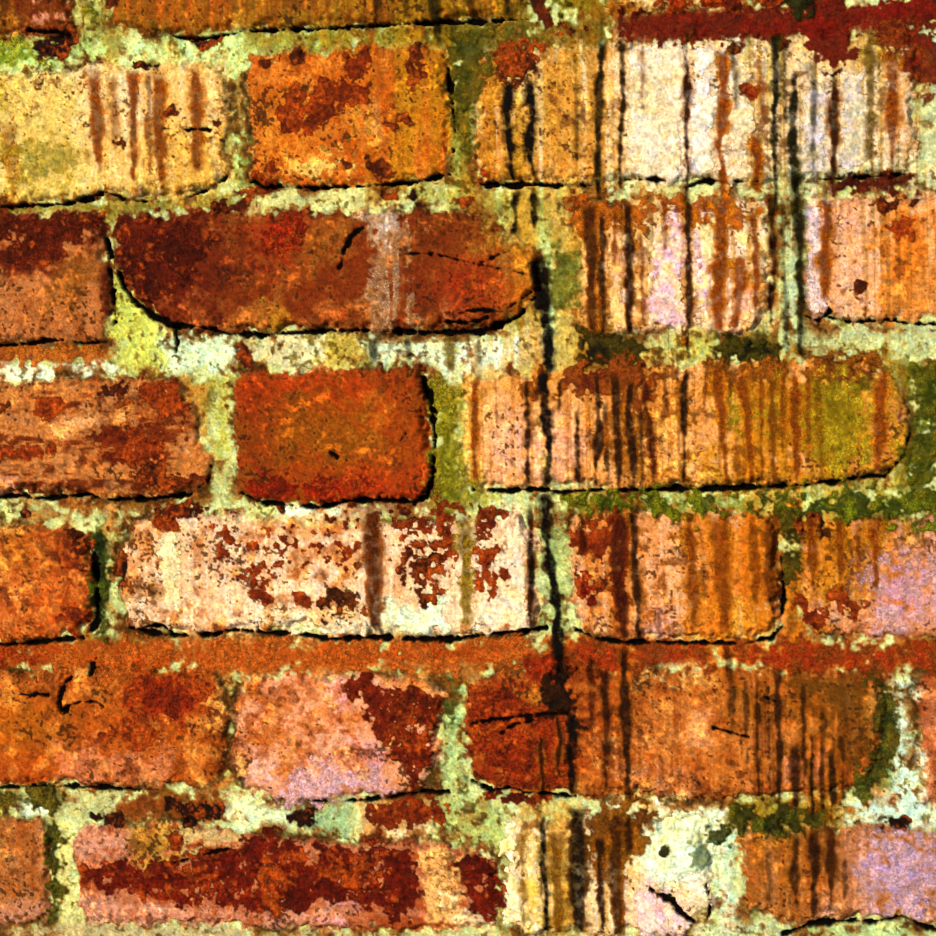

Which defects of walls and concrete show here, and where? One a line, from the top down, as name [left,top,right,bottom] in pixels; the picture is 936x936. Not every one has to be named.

rust [86,72,168,182]
rust [187,70,206,169]
rust [564,188,771,237]
crack [0,238,542,353]
leakage [573,371,689,485]
rust [801,349,887,395]
leakage [361,513,385,631]
leakage [522,257,635,798]
crack [0,550,104,715]
crack [0,782,159,792]
leakage [538,809,635,934]
crack [647,883,712,931]